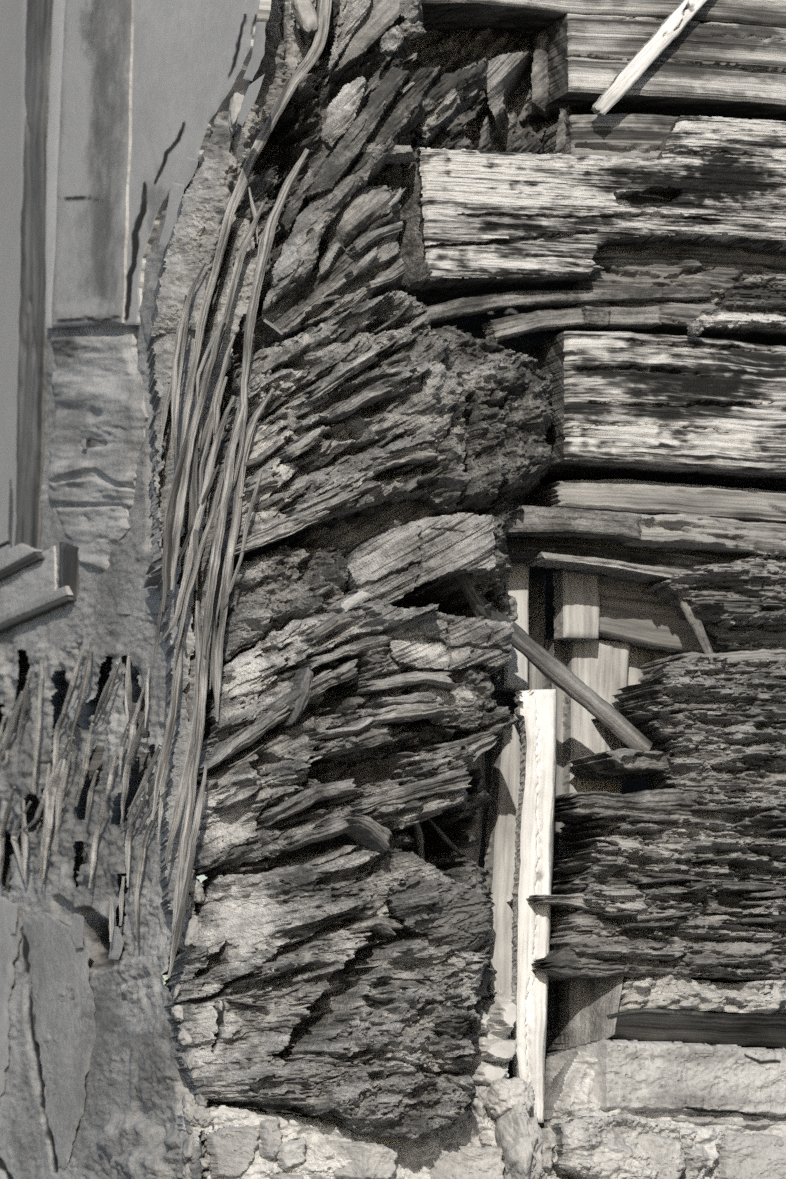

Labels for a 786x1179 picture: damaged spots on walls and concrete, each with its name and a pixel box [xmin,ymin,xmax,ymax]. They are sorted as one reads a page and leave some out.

crack [228,14,257,76]
peeling [228,22,266,132]
peeling [158,157,198,248]